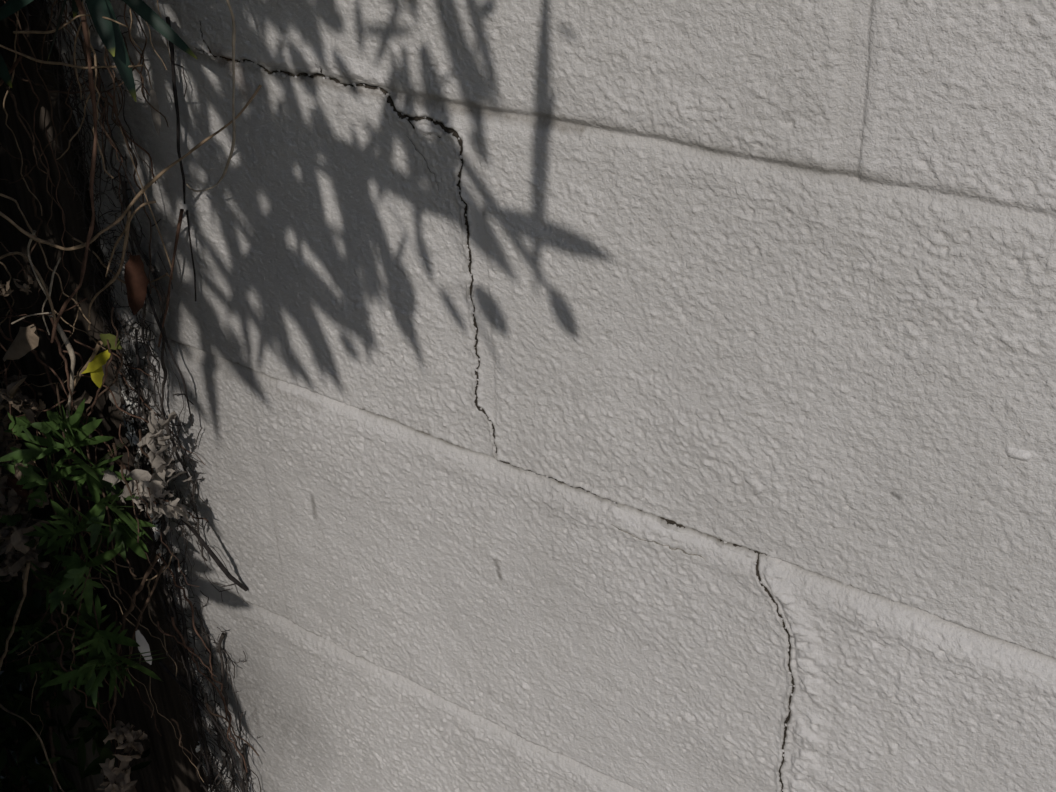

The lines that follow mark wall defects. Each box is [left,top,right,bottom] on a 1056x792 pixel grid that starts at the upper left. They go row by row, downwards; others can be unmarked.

crack [194,22,795,792]